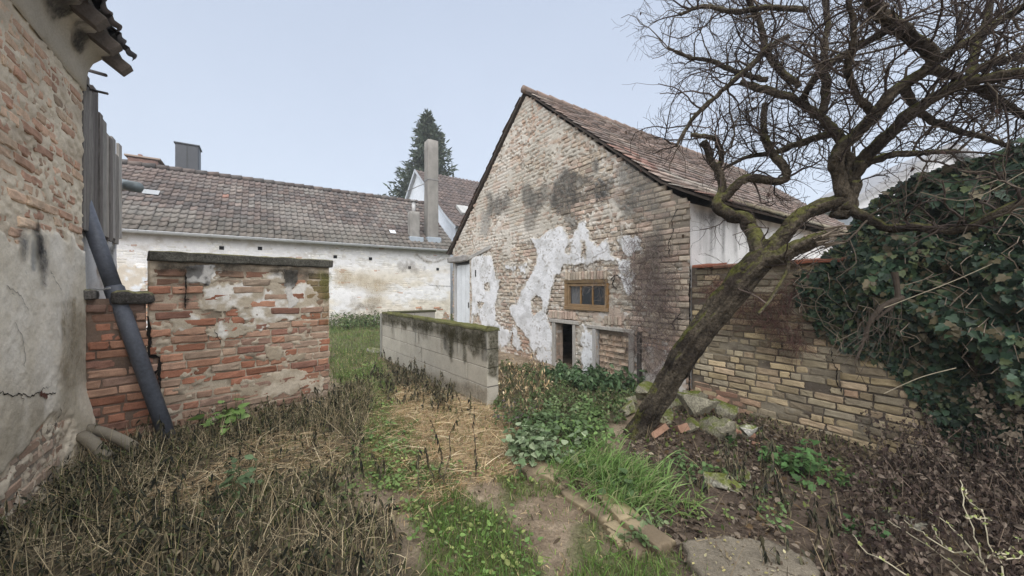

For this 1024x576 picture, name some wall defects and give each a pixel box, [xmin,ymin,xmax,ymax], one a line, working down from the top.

damp [522,161,667,248]
damp [21,224,47,268]
crack [179,272,190,308]
peeling [168,264,319,341]
peeling [471,220,644,375]
crack [0,387,62,435]
crack [146,316,163,389]
peeling [225,345,325,405]
peeling [634,341,669,383]
spalling [0,420,67,532]